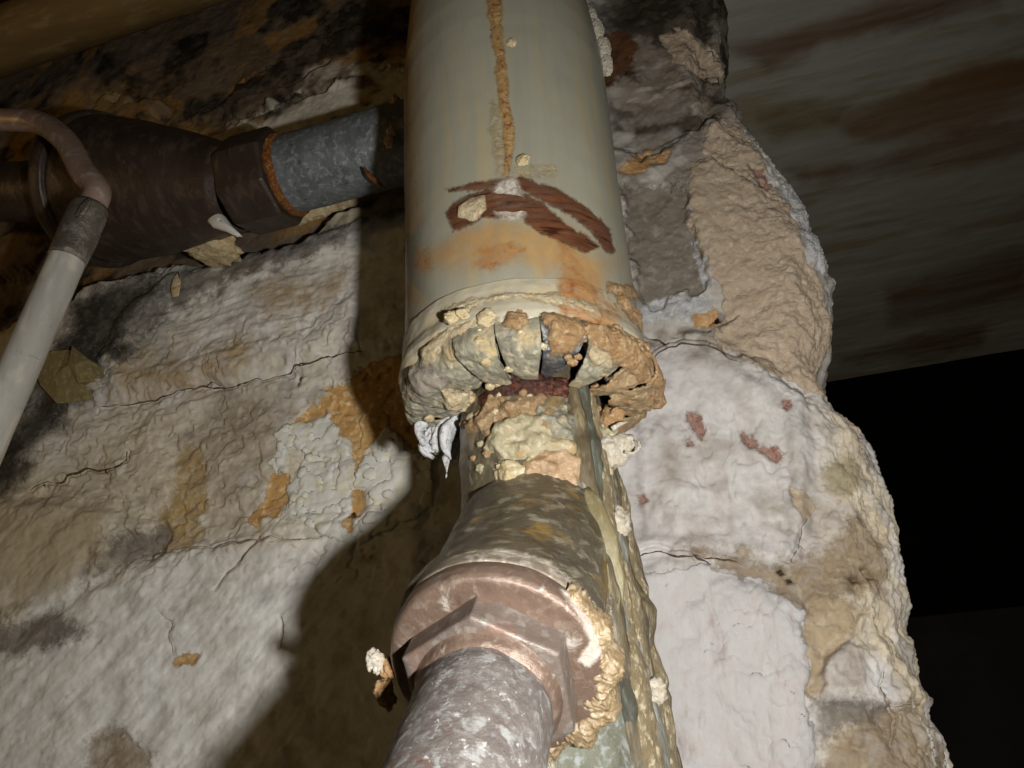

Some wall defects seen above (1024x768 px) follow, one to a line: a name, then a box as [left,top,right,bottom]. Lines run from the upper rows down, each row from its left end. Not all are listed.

rust [487,0,515,178]
rust [262,132,310,217]
crack [101,351,364,407]
rust [478,371,569,407]
crack [30,452,128,491]
peeling [248,355,433,546]
crack [151,535,325,589]
damp [692,515,888,614]